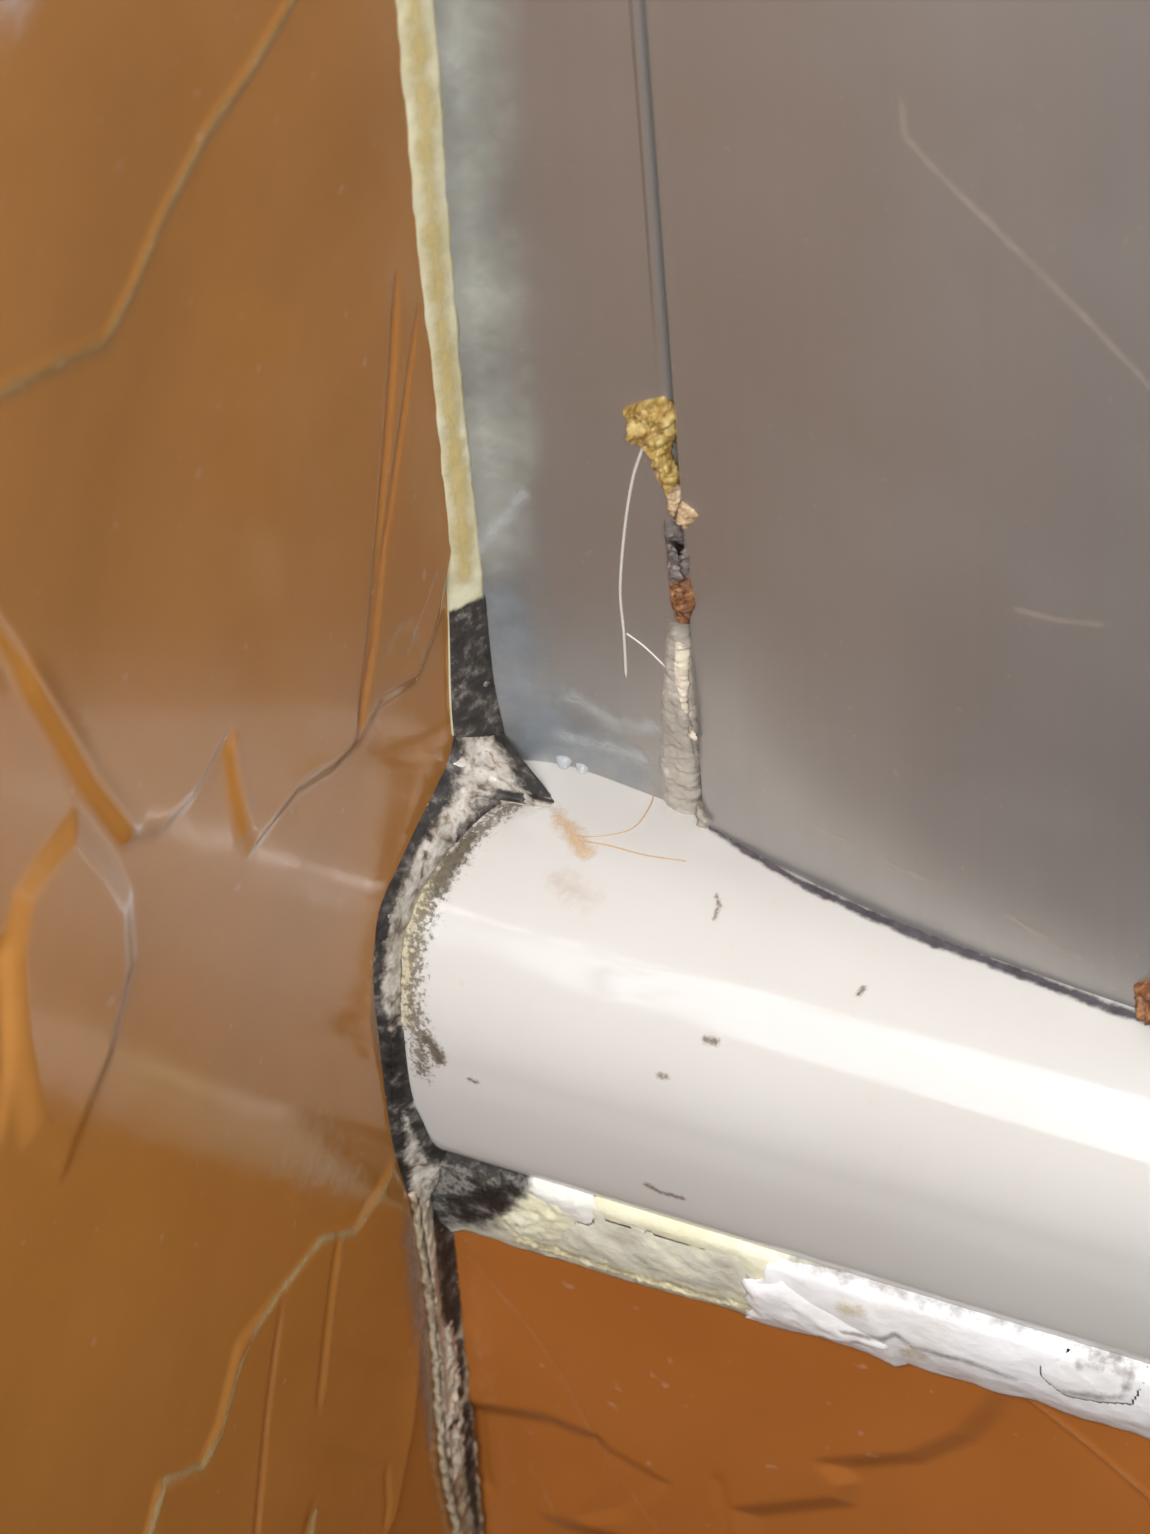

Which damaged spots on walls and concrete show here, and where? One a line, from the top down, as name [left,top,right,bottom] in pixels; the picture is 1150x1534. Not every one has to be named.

crack [0,0,295,397]
damp [412,0,470,582]
damp [373,597,554,1534]
rust [1133,979,1150,1026]
crack [148,1185,387,1534]